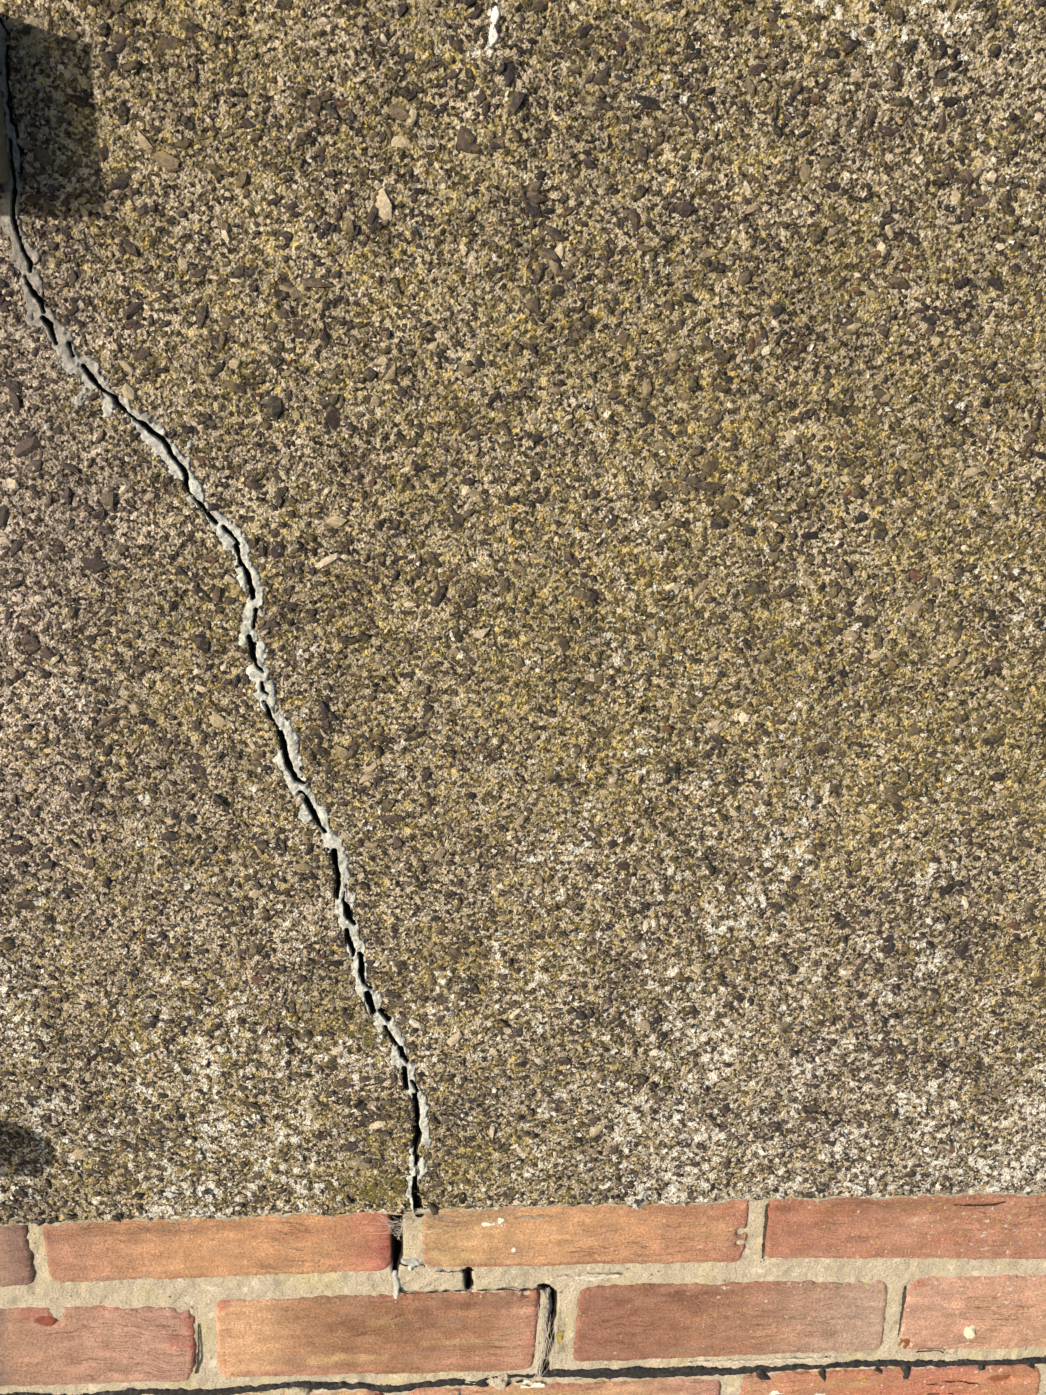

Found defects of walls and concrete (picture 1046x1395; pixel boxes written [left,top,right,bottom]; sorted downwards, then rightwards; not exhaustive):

crack [0,15,432,1218]
crack [954,1200,1006,1208]
crack [761,1204,770,1259]
crack [398,1262,542,1294]
crack [959,1304,1033,1320]
crack [193,1323,201,1374]
crack [897,1286,980,1395]